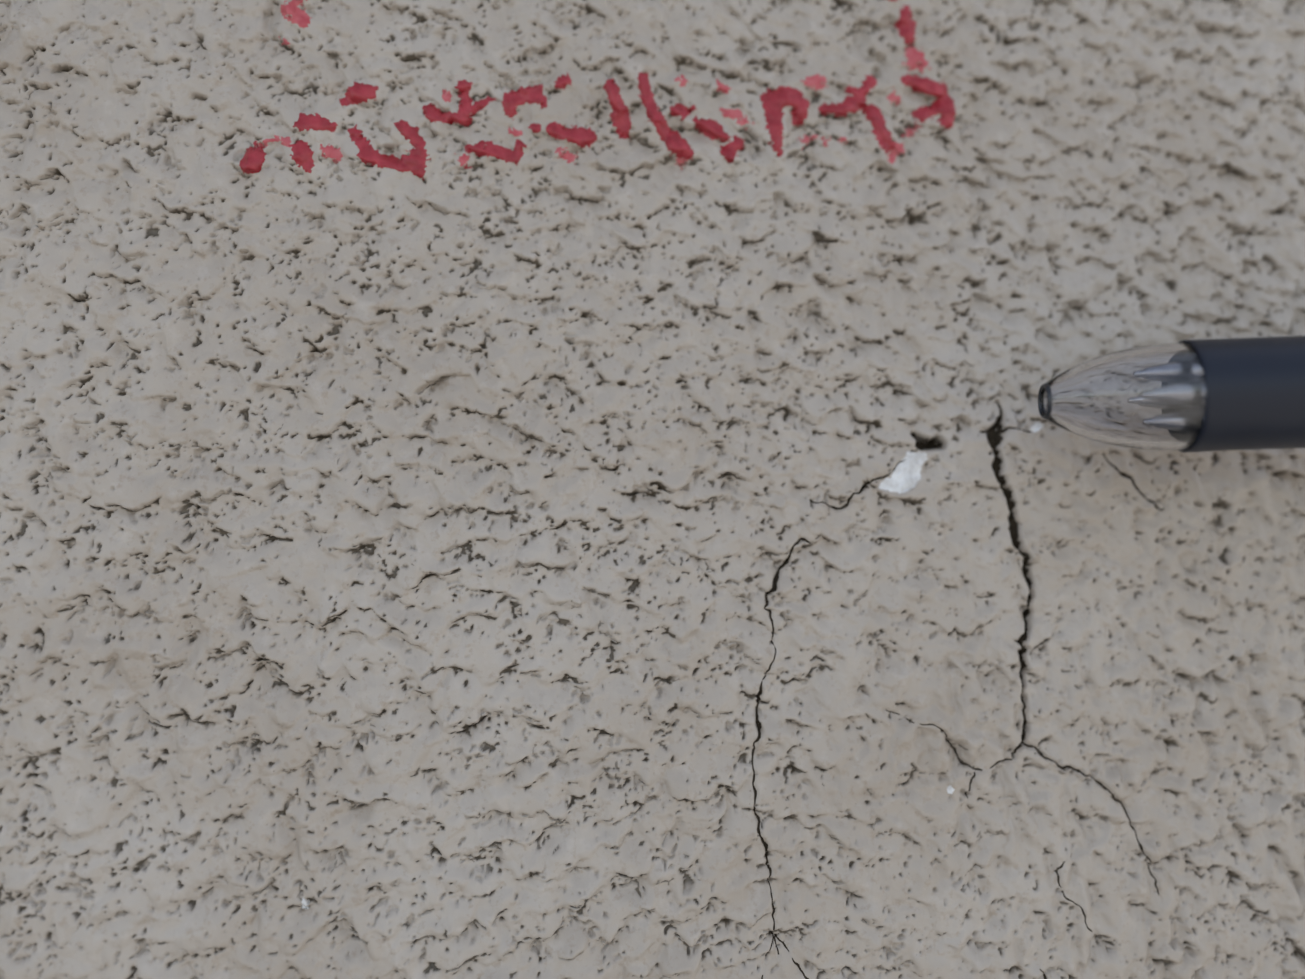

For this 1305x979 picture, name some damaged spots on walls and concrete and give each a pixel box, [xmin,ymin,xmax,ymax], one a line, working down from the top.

crack [810,440,922,510]
crack [1103,453,1171,511]
crack [886,404,1159,895]
crack [751,538,811,979]
crack [1055,861,1097,937]